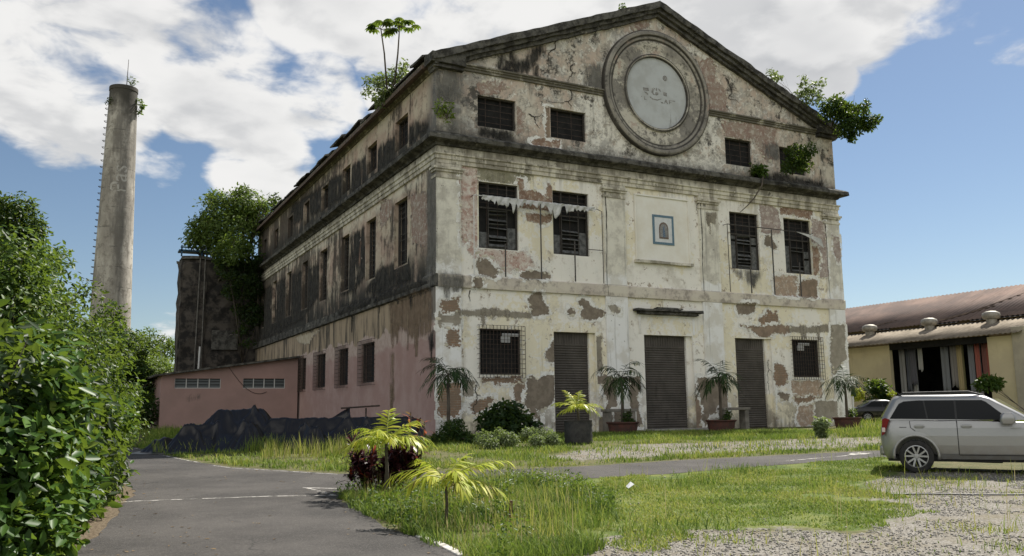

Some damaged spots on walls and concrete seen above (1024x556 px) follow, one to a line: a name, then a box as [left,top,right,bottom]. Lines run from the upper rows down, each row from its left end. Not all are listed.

water stain [498,45,545,77]
water stain [291,122,427,227]
water stain [259,265,319,340]
water stain [338,171,463,417]
peeling [434,166,624,352]
peeling [733,204,842,340]
spalling [434,337,555,426]
spalling [773,321,849,427]